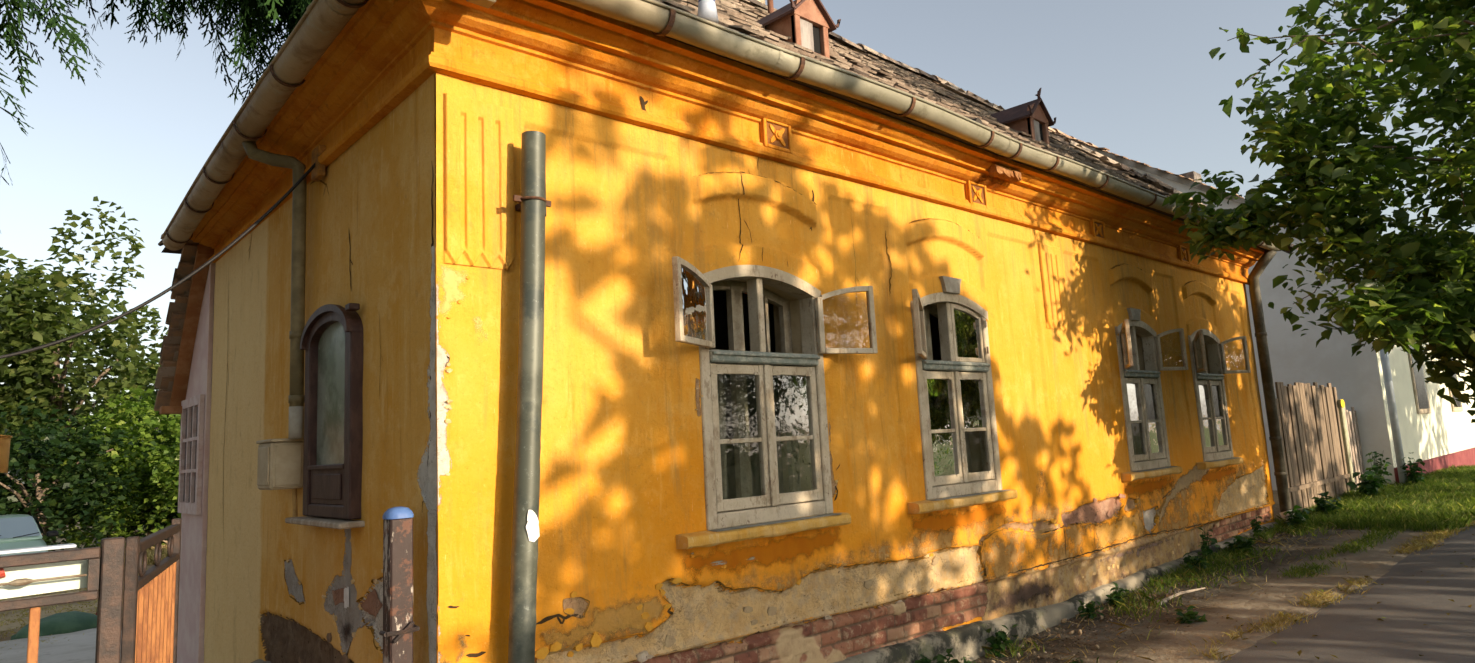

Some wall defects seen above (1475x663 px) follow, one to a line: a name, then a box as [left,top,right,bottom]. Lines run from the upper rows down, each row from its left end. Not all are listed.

crack [693,157,816,264]
crack [851,218,979,335]
flaking render [417,166,470,663]
peeling [829,423,838,497]
flaking render [260,528,383,663]
flaking render [535,461,1271,663]